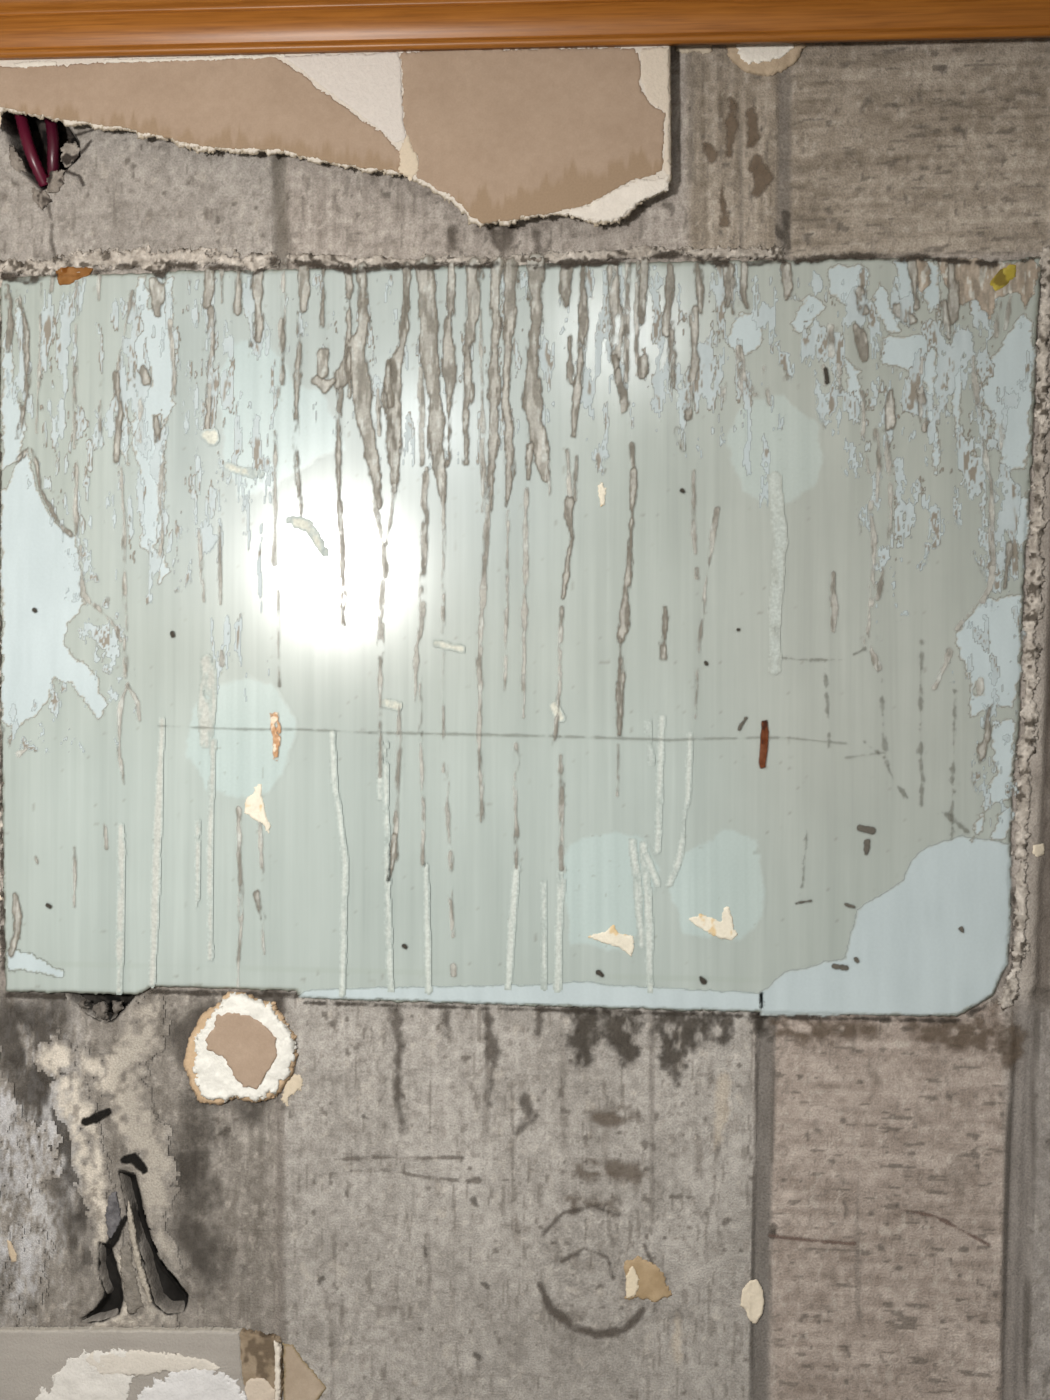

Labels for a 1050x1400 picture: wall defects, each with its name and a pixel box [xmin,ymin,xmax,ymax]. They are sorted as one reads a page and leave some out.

spalling [9,115,80,210]
crack [94,258,497,279]
crack [533,250,1039,269]
leakage [606,257,704,421]
leakage [198,224,589,998]
peeling [300,257,1040,1017]
rust [270,712,281,761]
rust [759,720,769,768]
leakage [0,717,215,1328]
spalling [281,1074,304,1106]
leakage [569,1006,733,1079]
crack [83,1153,188,1323]